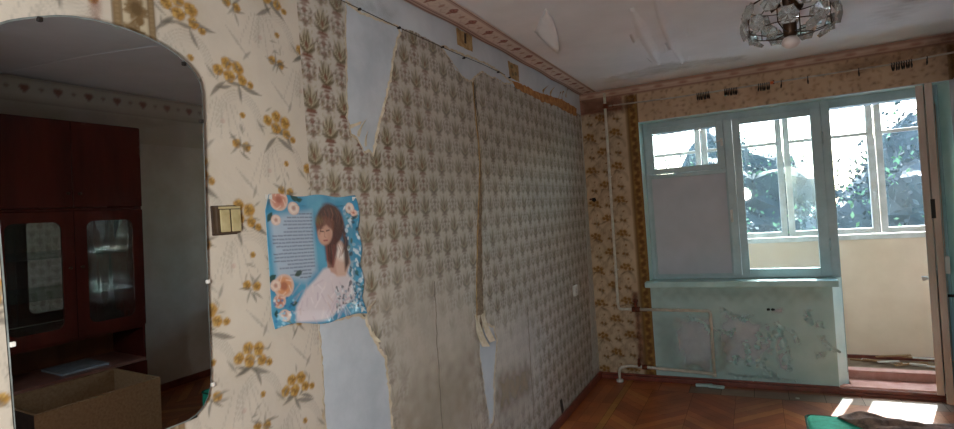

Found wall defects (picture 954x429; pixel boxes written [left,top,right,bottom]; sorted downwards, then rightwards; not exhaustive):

peeling [344,0,577,157]
peeling [318,300,394,429]
peeling [479,323,498,429]